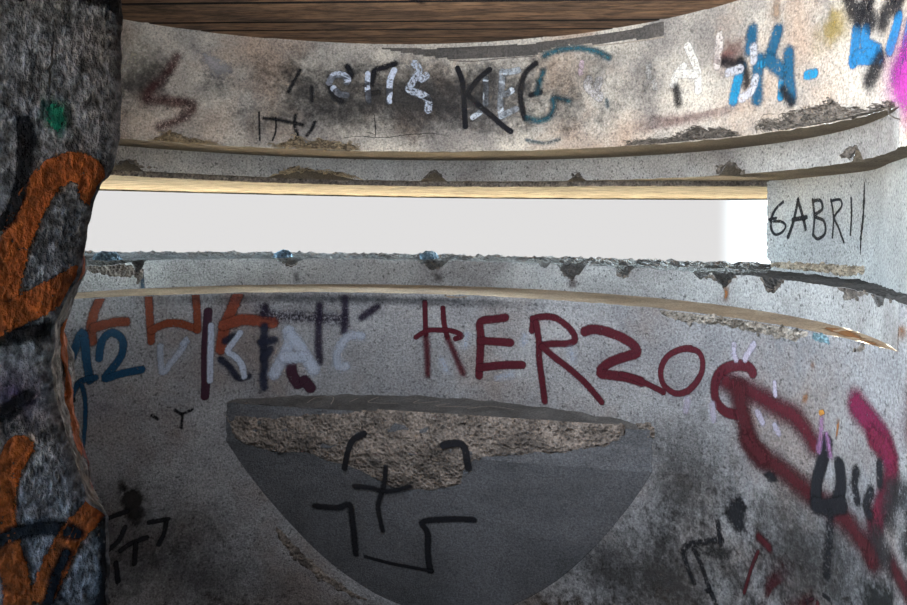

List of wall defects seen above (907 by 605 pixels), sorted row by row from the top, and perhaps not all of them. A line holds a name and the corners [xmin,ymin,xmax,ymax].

spalling [754,97,900,133]
spalling [623,125,740,146]
spalling [760,278,784,293]
spalling [771,261,892,308]
spalling [51,240,144,512]